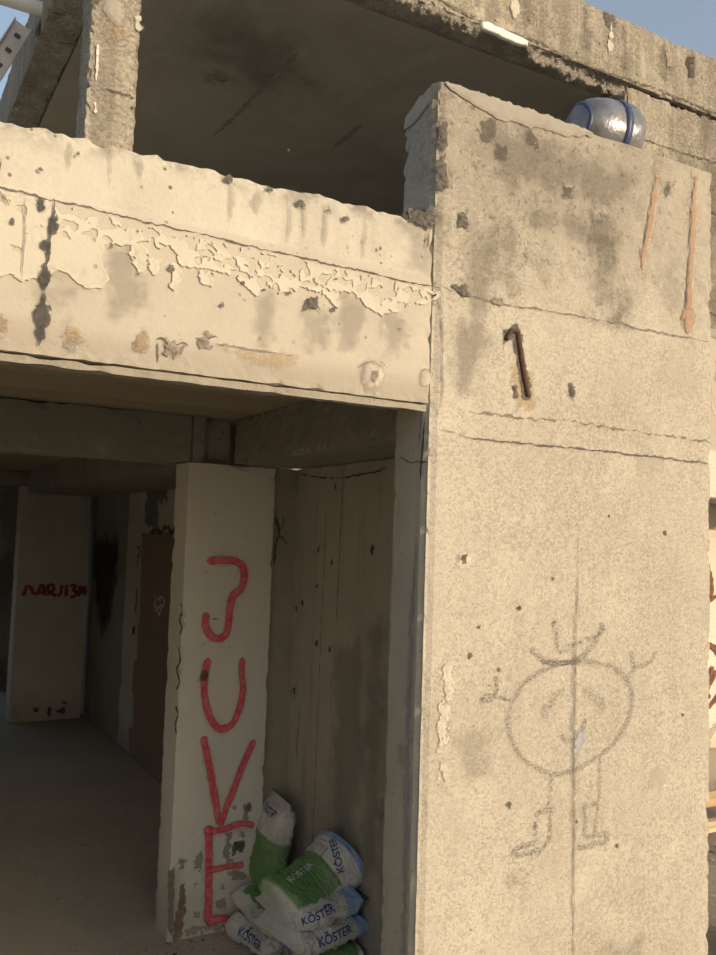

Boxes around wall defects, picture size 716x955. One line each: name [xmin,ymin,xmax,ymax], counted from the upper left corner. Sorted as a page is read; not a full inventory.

leakage [34,196,59,346]
peeling [0,189,441,317]
crack [0,162,708,403]
rust [638,176,659,269]
rust [682,179,699,333]
crack [442,411,711,465]
peeling [167,851,225,941]
peeling [215,804,251,910]